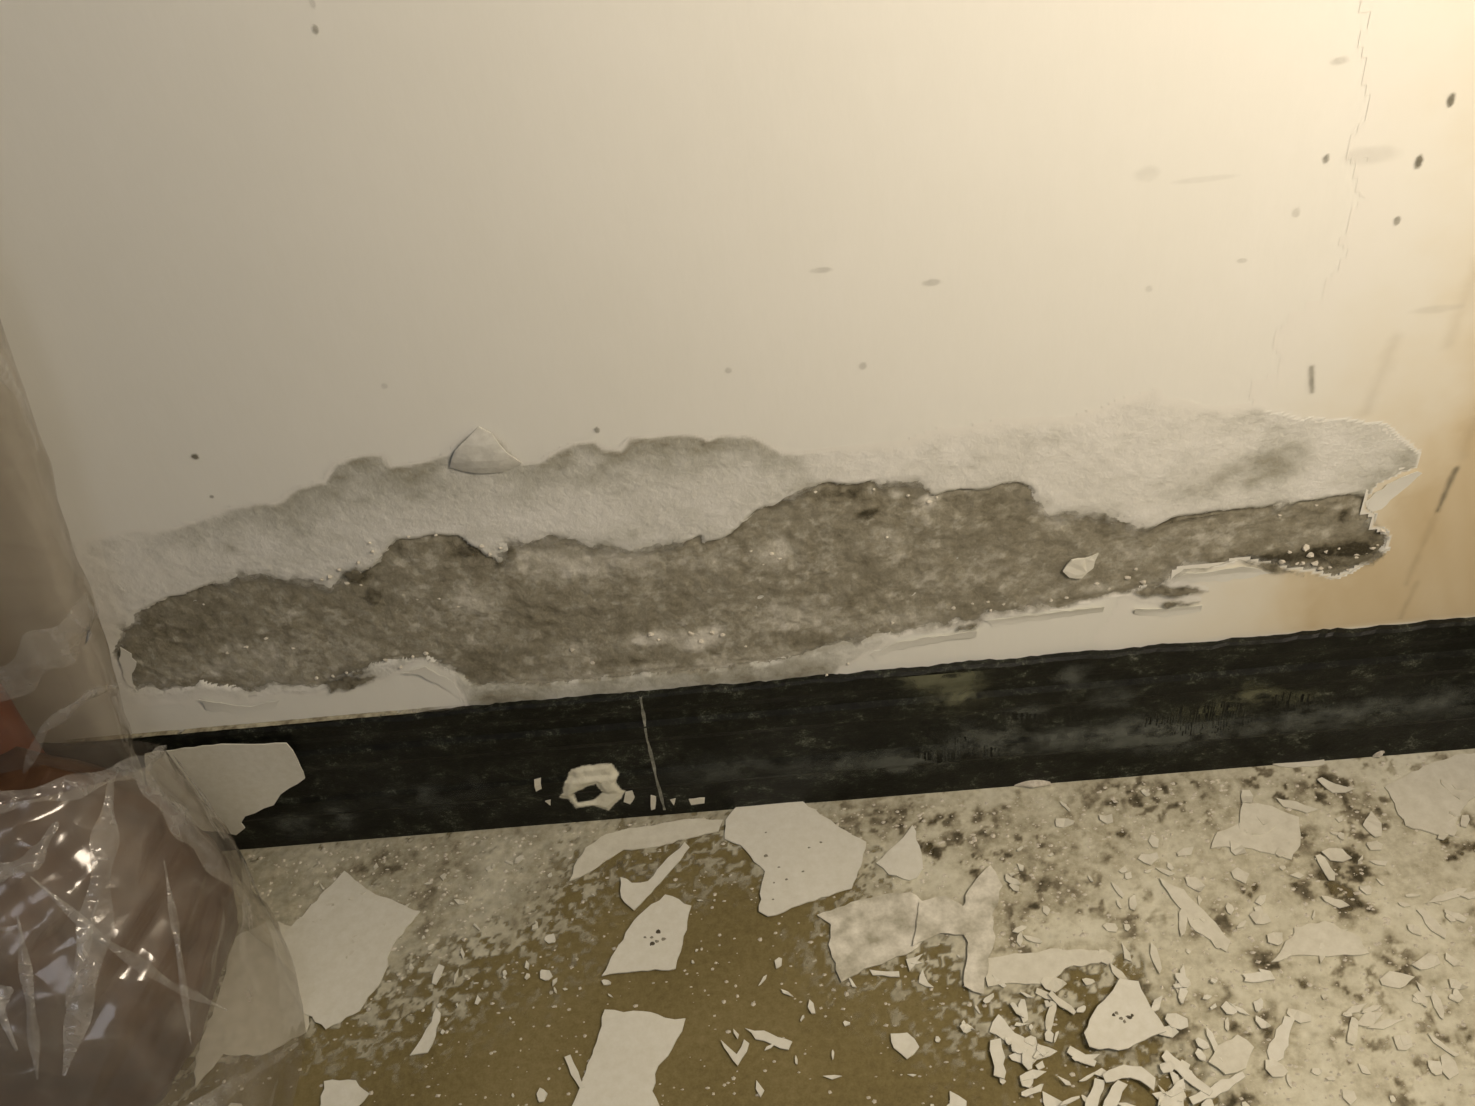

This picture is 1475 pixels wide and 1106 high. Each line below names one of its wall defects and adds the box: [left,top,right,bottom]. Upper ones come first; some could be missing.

peeling [72,387,1422,715]
water stain [1093,0,1475,650]